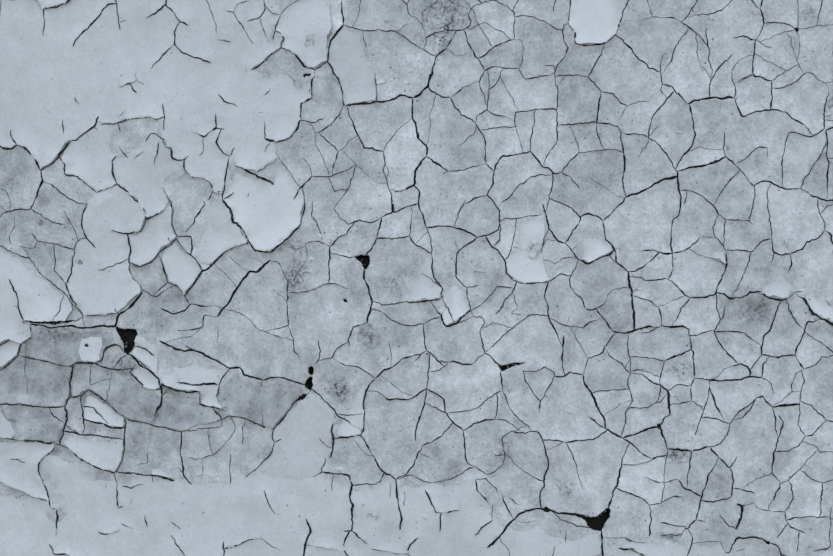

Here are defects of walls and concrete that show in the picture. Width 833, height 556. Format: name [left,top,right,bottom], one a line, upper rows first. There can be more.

crack [121,0,211,93]
peeling [568,0,621,44]
crack [0,116,284,332]
peeling [0,0,385,407]
crack [160,315,305,396]
crack [195,115,305,253]
peeling [406,258,469,325]
crack [264,0,833,556]
peeling [762,281,793,298]
peeling [805,294,833,322]
crack [0,338,265,532]
peeling [0,364,741,556]